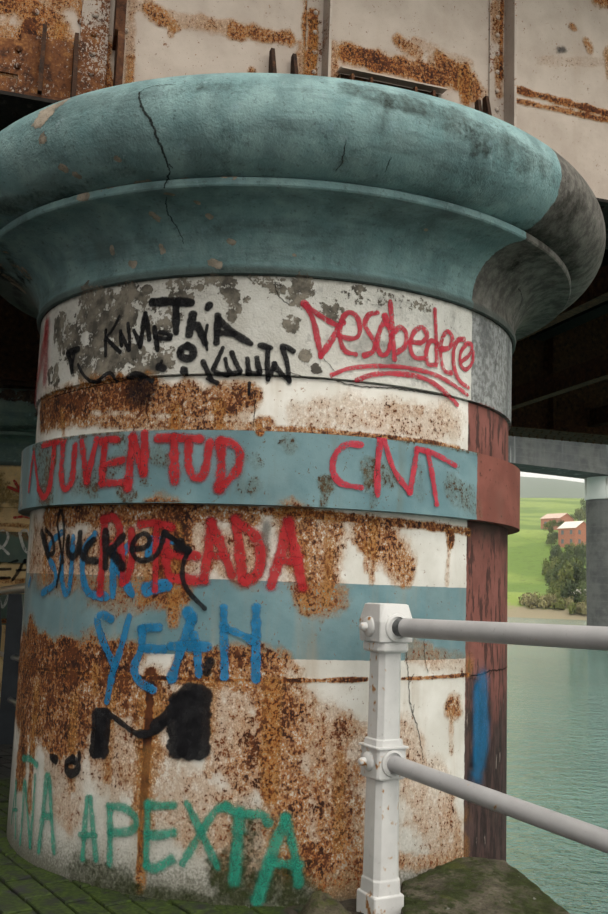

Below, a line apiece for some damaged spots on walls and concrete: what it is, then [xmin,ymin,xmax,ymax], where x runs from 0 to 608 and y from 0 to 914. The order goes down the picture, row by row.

rust [0,0,83,44]
rust [126,29,135,83]
rust [128,0,319,76]
rust [331,0,504,106]
rust [517,86,608,122]
crack [138,84,184,244]
peeling [47,258,431,392]
rust [0,371,480,628]
rust [15,614,368,898]
crack [406,645,428,761]
rust [445,690,461,733]
rust [399,778,467,874]